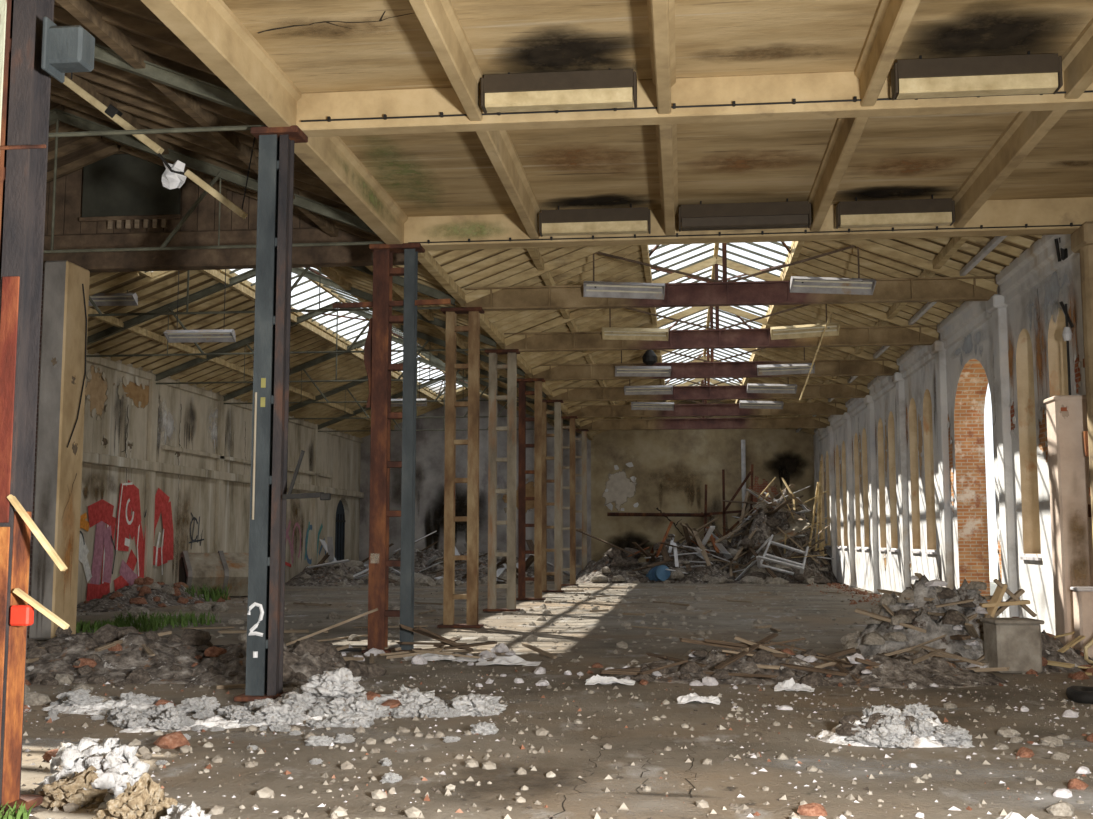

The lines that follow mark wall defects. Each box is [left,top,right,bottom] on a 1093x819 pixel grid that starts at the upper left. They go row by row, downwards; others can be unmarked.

flaking render [114,376,163,409]
flaking render [602,462,639,511]
leakage [779,466,790,487]